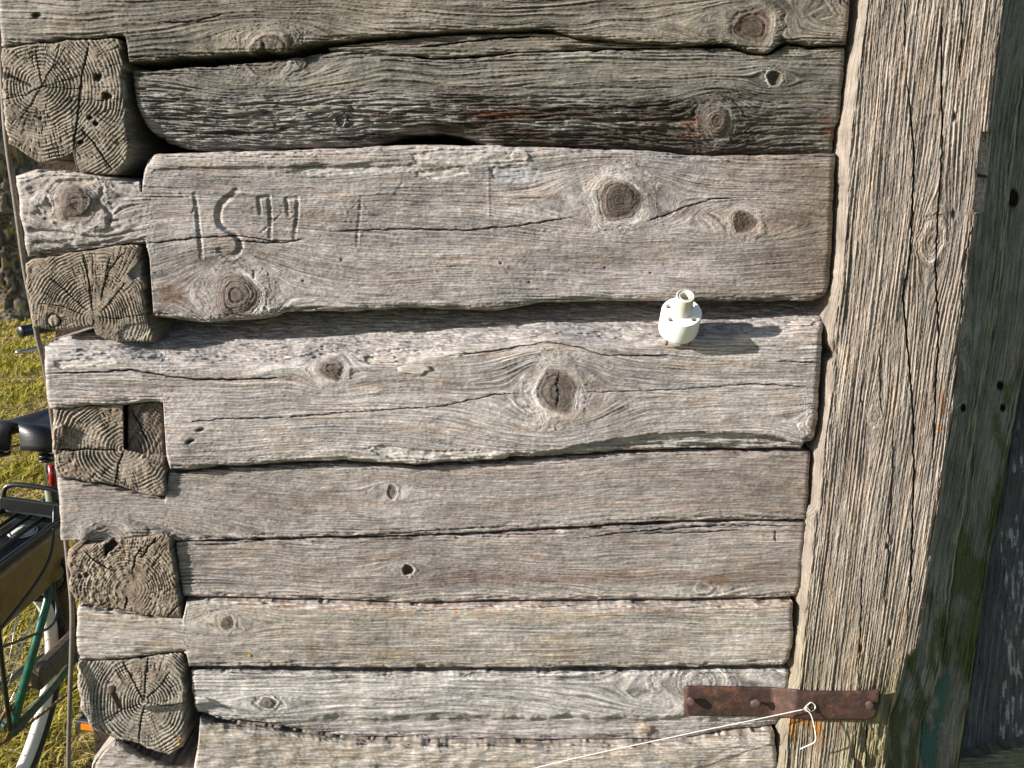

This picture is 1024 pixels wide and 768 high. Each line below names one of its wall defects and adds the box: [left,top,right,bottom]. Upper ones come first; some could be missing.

crack [150,235,299,243]
crack [858,0,972,678]